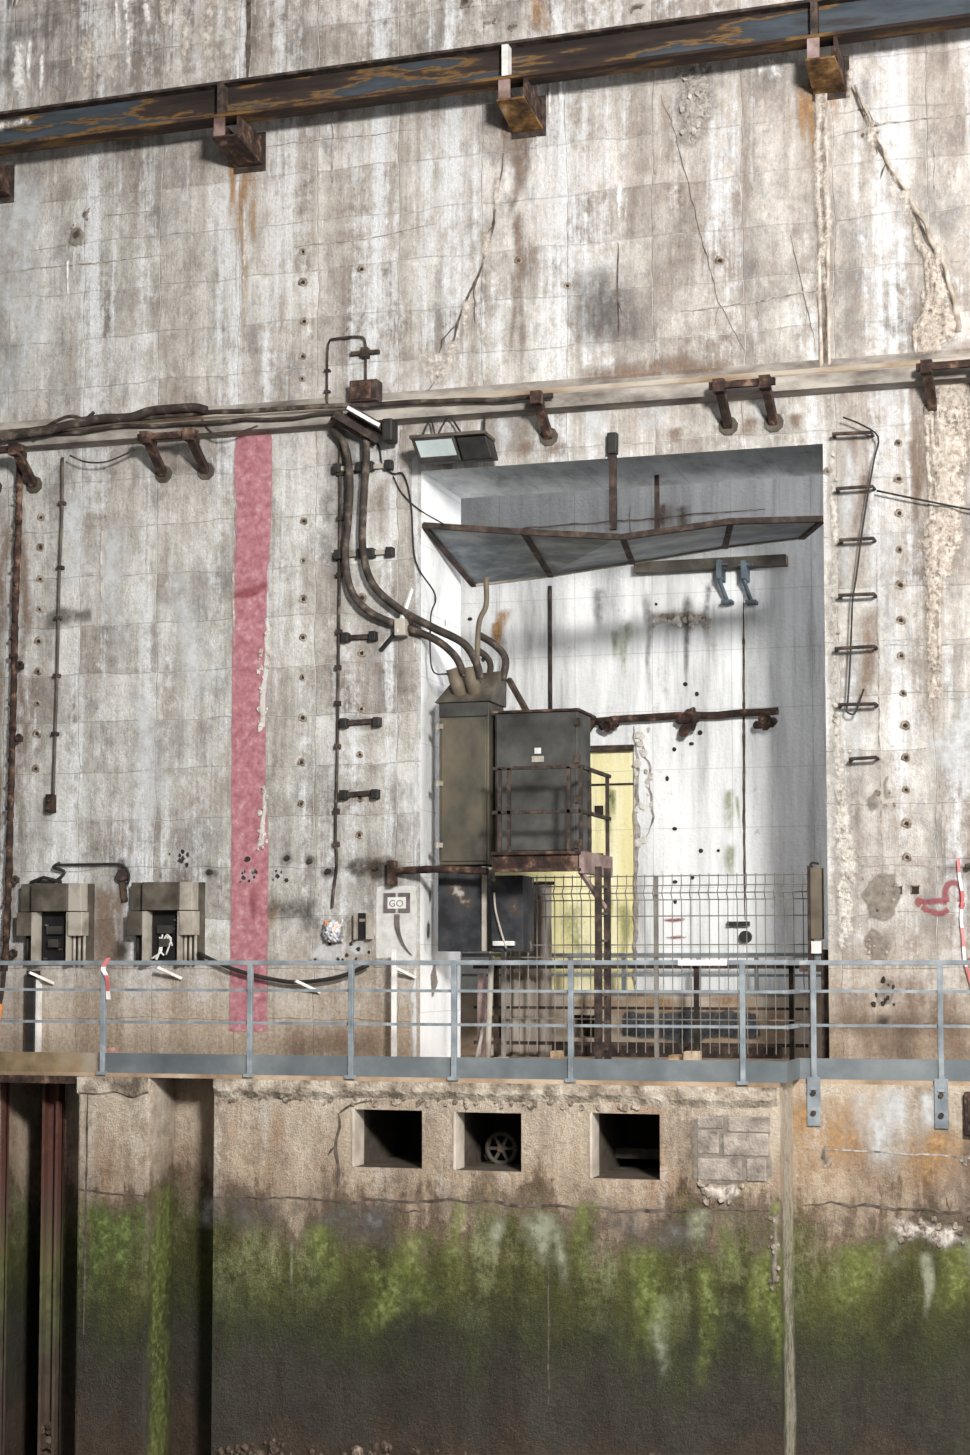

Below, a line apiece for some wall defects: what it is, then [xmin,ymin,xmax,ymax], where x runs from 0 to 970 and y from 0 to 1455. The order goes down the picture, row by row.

rust [502,116,527,194]
rust [799,82,815,151]
crack [850,86,953,305]
crack [428,153,504,391]
damp [531,1215,564,1262]
damp [783,1099,795,1455]
damp [922,1255,933,1300]